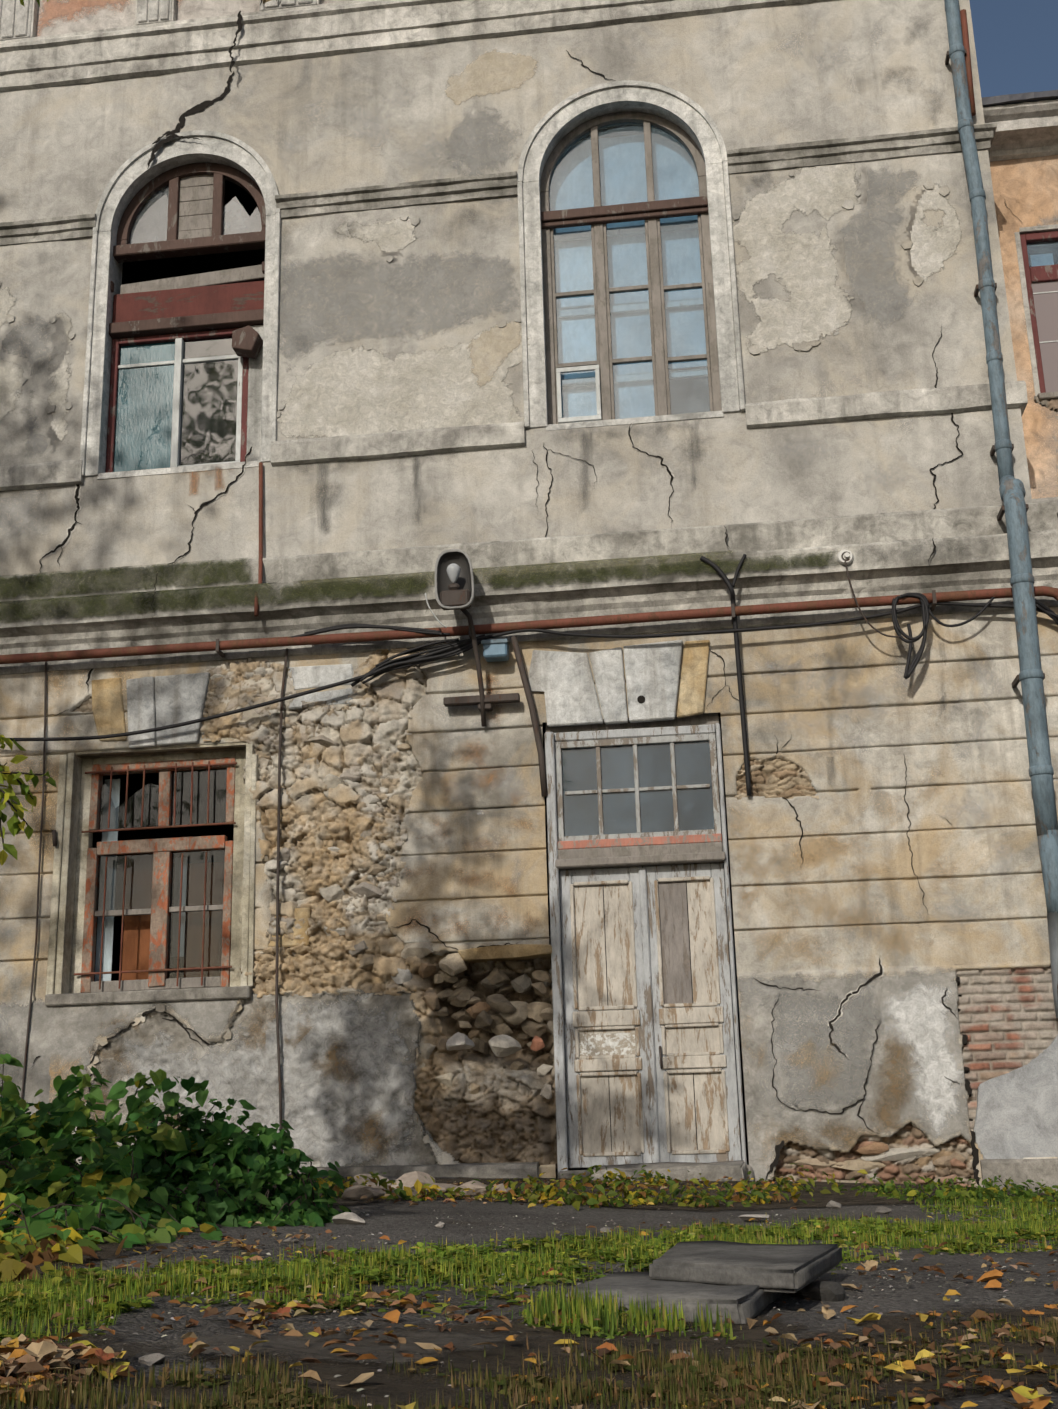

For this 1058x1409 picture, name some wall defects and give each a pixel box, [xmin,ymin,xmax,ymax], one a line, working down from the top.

crack [147,0,277,168]
peeling [728,163,861,355]
peeling [901,181,962,287]
peeling [0,359,28,421]
peeling [44,313,75,444]
crack [39,484,82,573]
crack [151,446,253,617]
crack [628,423,675,526]
crack [928,326,963,566]
flaking render [735,735,819,800]
crack [752,958,885,1180]
flaking render [773,964,1058,1187]